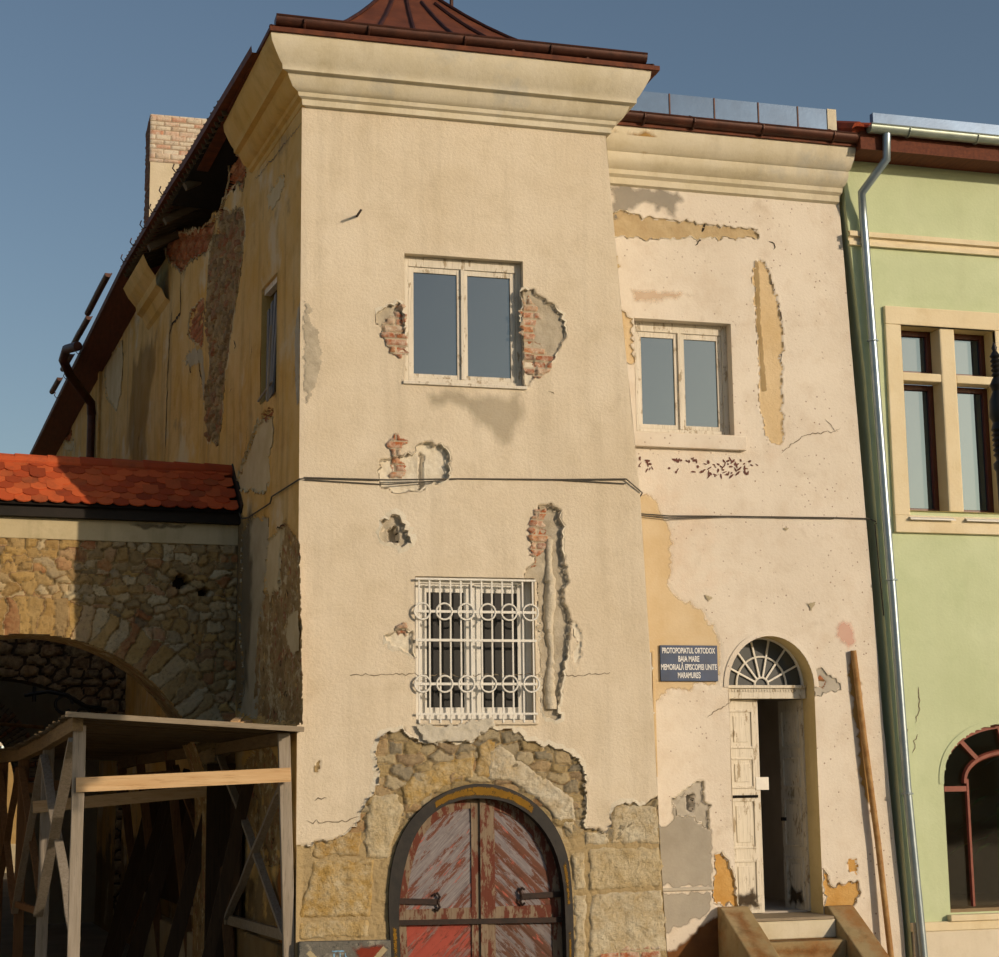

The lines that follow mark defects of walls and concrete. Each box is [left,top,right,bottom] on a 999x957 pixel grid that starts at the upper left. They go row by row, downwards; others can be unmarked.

peeling [613,210,759,242]
crack [165,275,202,446]
spalling [375,299,409,358]
spalling [518,286,568,388]
peeling [752,260,785,445]
spalling [378,433,451,494]
peeling [254,520,303,725]
peeling [244,747,278,770]
peeling [244,782,280,870]
flaking render [296,717,667,957]
peeling [712,852,759,907]
peeling [822,858,862,907]